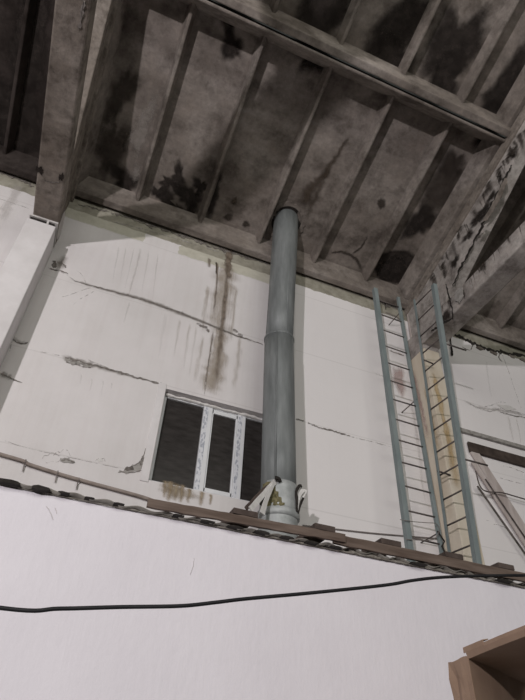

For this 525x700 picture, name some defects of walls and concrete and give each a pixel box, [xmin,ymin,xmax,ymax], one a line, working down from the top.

leakage [365,0,429,67]
leakage [423,8,487,94]
leakage [482,46,525,114]
leakage [98,71,155,191]
leakage [151,163,221,216]
leakage [375,251,414,283]
crack [431,165,525,380]
crack [63,278,263,345]
crack [44,352,161,384]
spalling [118,448,146,474]
crack [296,419,380,444]